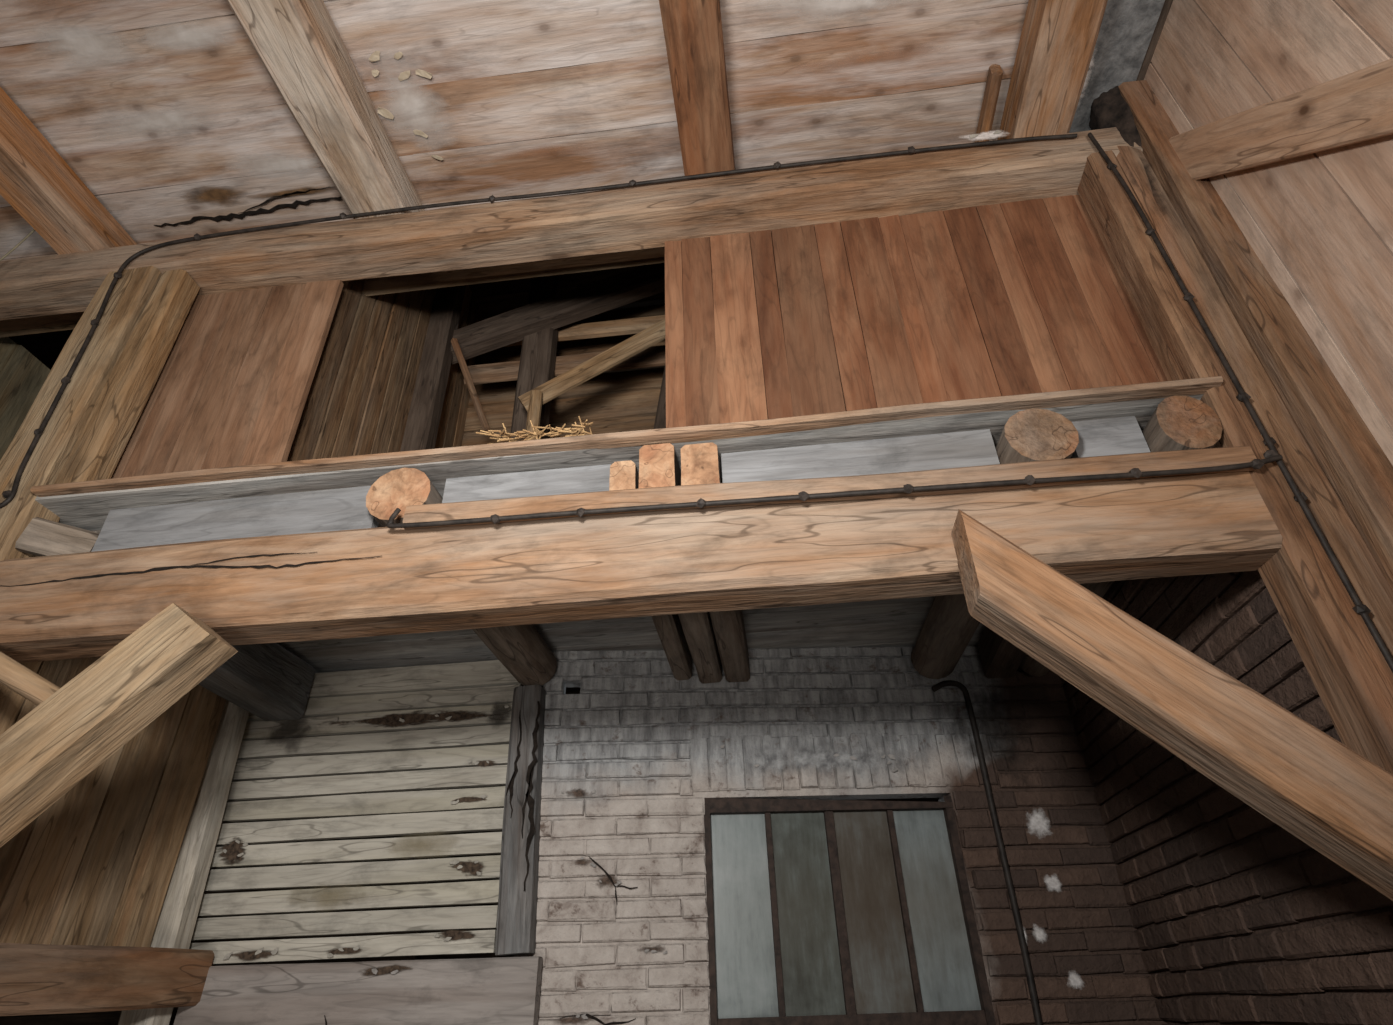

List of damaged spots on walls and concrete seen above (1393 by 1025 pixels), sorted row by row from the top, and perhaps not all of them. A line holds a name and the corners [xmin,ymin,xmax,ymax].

crack [154,187,342,227]
peeling [331,711,489,728]
crack [506,701,540,891]